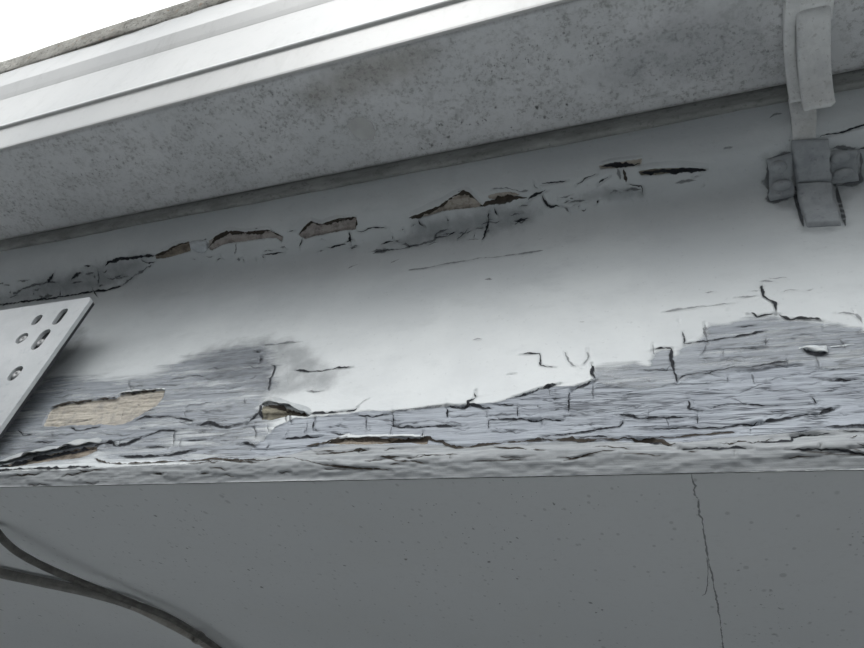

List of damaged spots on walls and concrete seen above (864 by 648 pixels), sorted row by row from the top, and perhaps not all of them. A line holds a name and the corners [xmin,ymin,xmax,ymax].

peeling [599,155,709,181]
peeling [407,186,527,219]
peeling [151,239,191,259]
peeling [204,226,283,250]
peeling [297,214,358,239]
crack [656,286,820,381]
peeling [0,319,864,487]
crack [0,351,864,486]
crack [691,474,724,648]